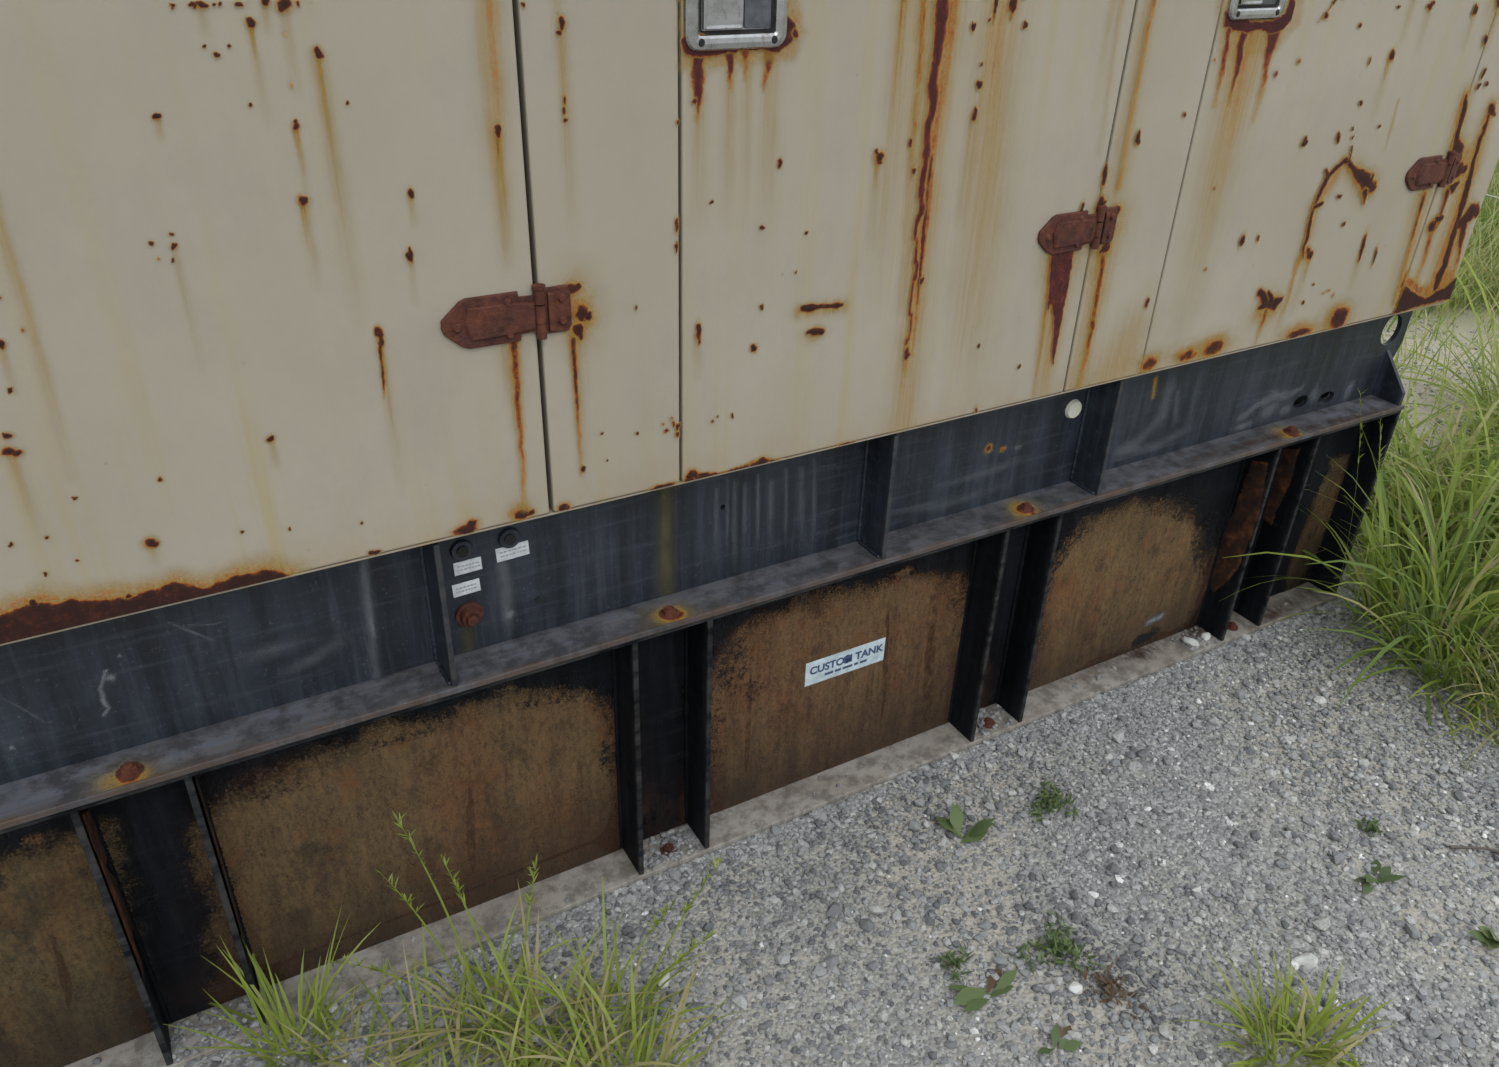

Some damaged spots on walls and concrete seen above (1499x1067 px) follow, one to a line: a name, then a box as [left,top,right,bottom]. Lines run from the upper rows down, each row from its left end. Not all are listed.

corrosion [169,0,300,43]
corrosion [313,45,325,97]
corrosion [680,2,800,119]
corrosion [1214,0,1296,142]
corrosion [297,195,309,216]
corrosion [896,0,1028,383]
corrosion [1078,0,1156,389]
corrosion [1358,232,1378,266]
corrosion [1393,67,1497,314]
corrosion [1018,251,1074,374]
corrosion [509,341,535,520]
corrosion [0,563,296,644]